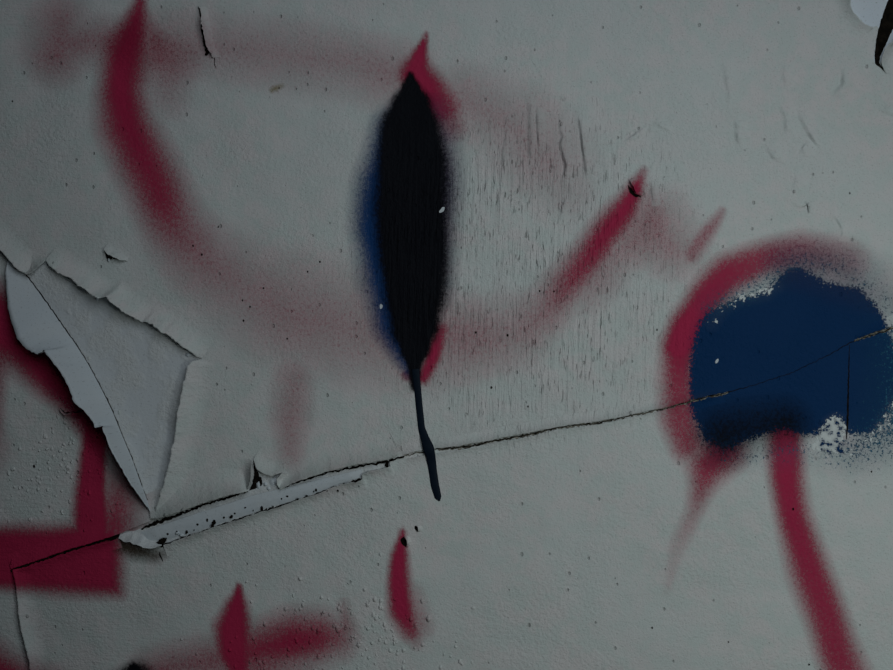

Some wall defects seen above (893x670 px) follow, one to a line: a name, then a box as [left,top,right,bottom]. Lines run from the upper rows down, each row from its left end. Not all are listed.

peeling [835,0,893,74]
peeling [0,219,405,561]
crack [401,315,893,466]
crack [7,506,151,670]